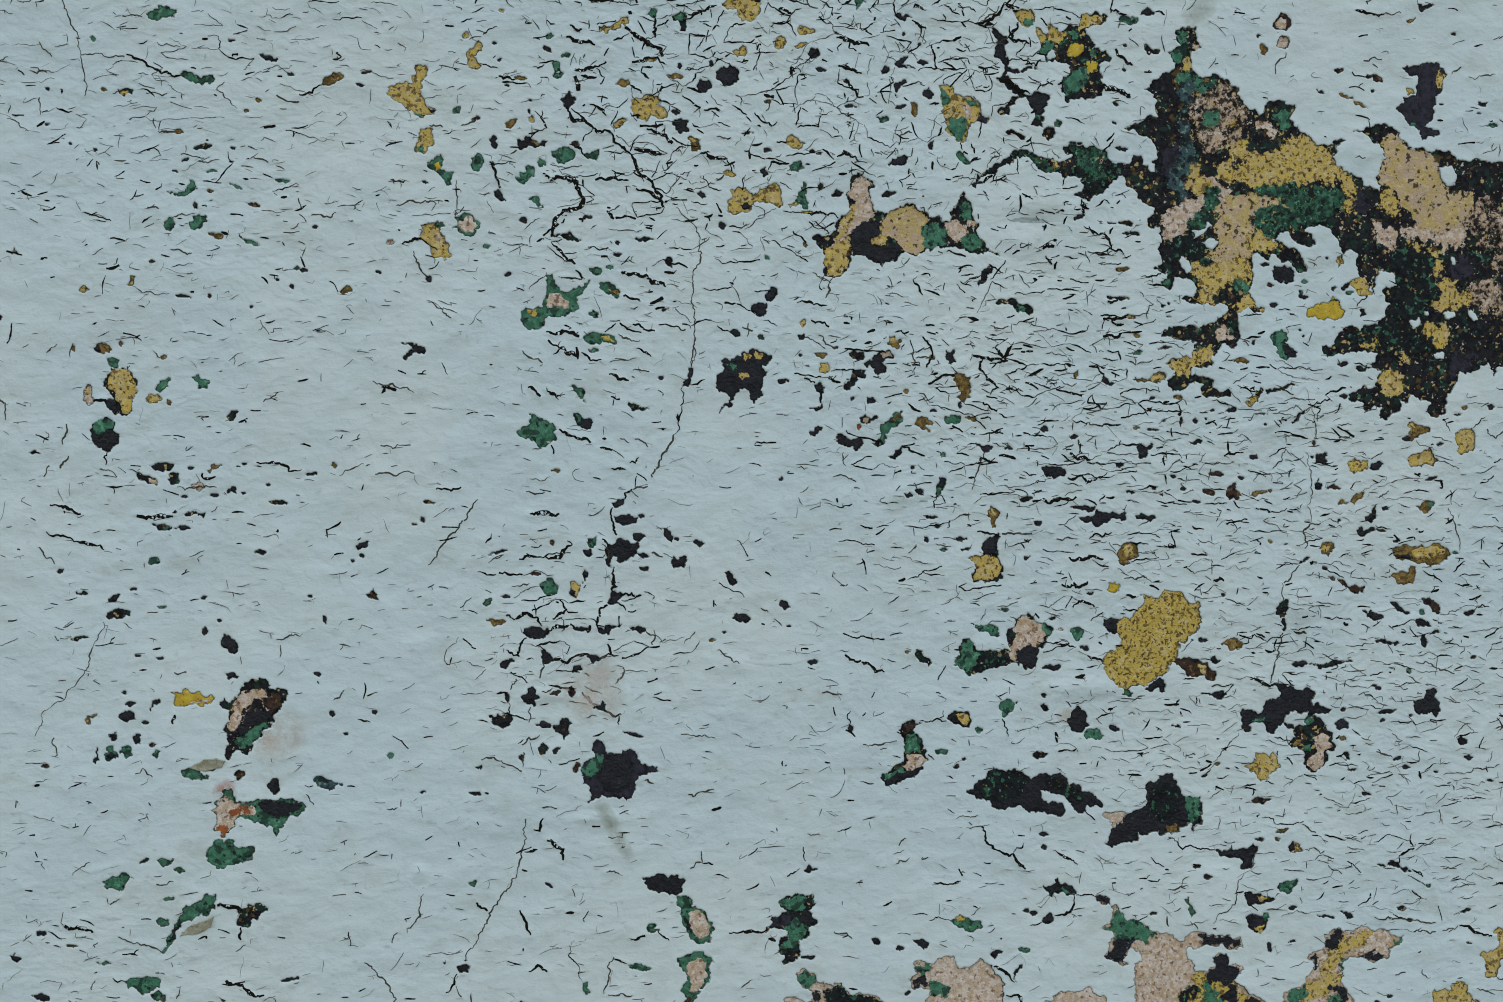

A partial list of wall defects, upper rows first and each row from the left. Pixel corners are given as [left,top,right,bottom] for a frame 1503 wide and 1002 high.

crack [1297,0,1503,159]
crack [255,243,367,345]
peeling [716,8,1503,481]
crack [194,369,308,433]
crack [428,462,478,565]
crack [707,402,799,511]
peeling [954,590,1255,714]
crack [0,567,355,1002]
peeling [573,701,657,802]
peeling [966,751,1301,879]
peeling [1240,683,1356,804]
peeling [1023,878,1297,1002]